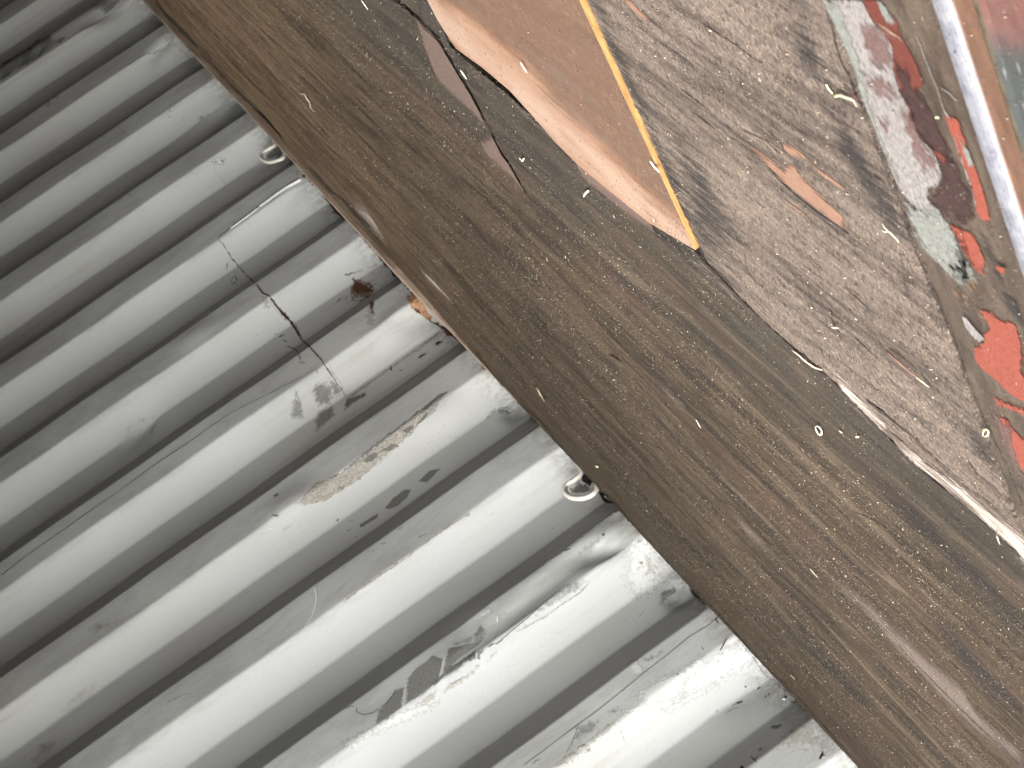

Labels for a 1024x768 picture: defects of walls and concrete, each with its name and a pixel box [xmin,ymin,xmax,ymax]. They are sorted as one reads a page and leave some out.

peeling [823,0,1005,285]
crack [219,240,346,397]
rust [336,272,375,324]
peeling [301,392,446,505]
crack [391,0,1022,558]
peeling [962,310,1024,478]
crack [599,489,857,763]